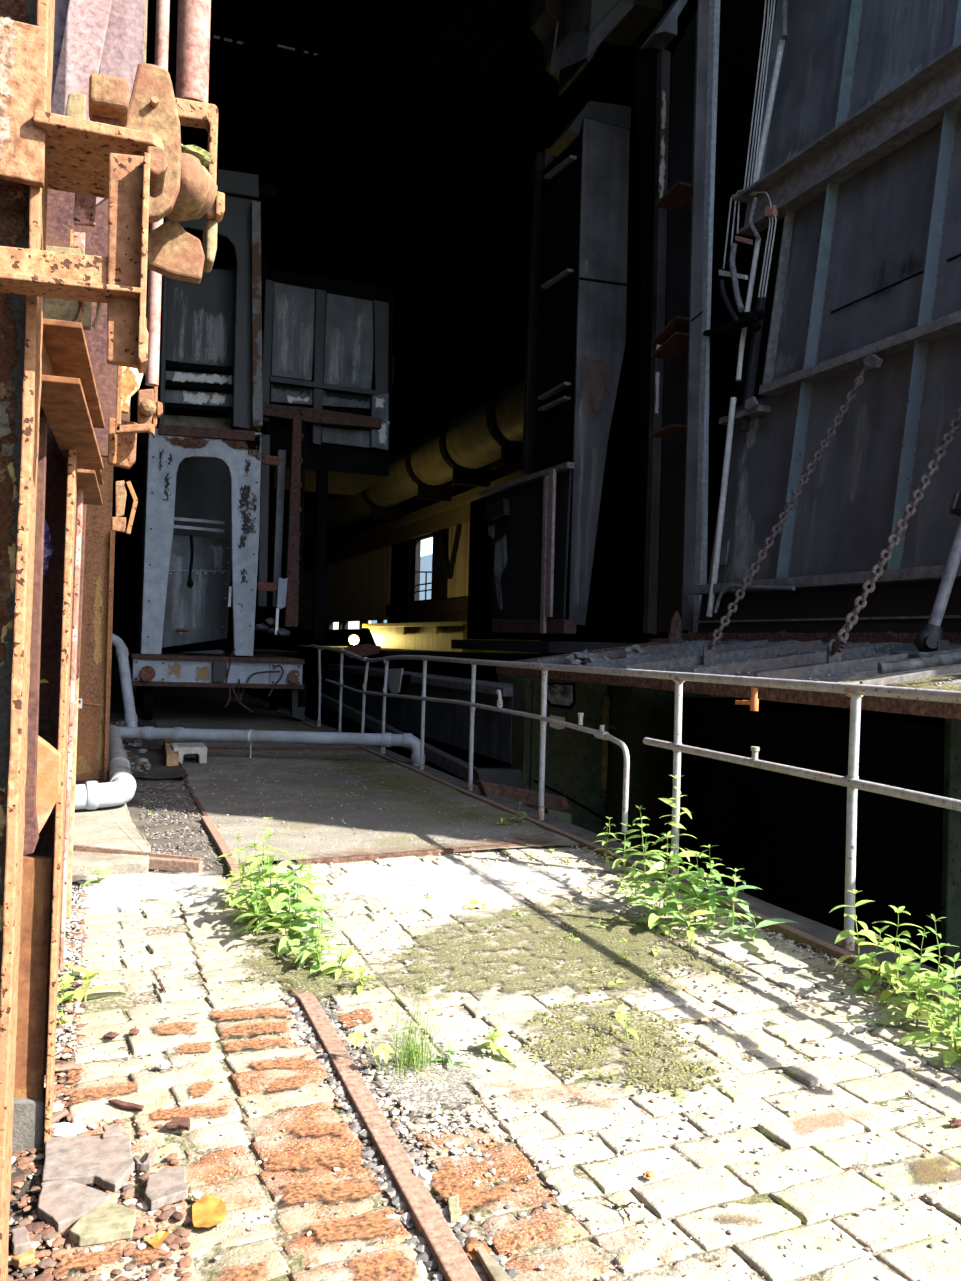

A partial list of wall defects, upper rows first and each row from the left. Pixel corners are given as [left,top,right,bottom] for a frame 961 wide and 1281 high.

rust [165,433,263,461]
peeling [8,543,16,593]
peeling [0,620,14,667]
rust [76,573,105,776]